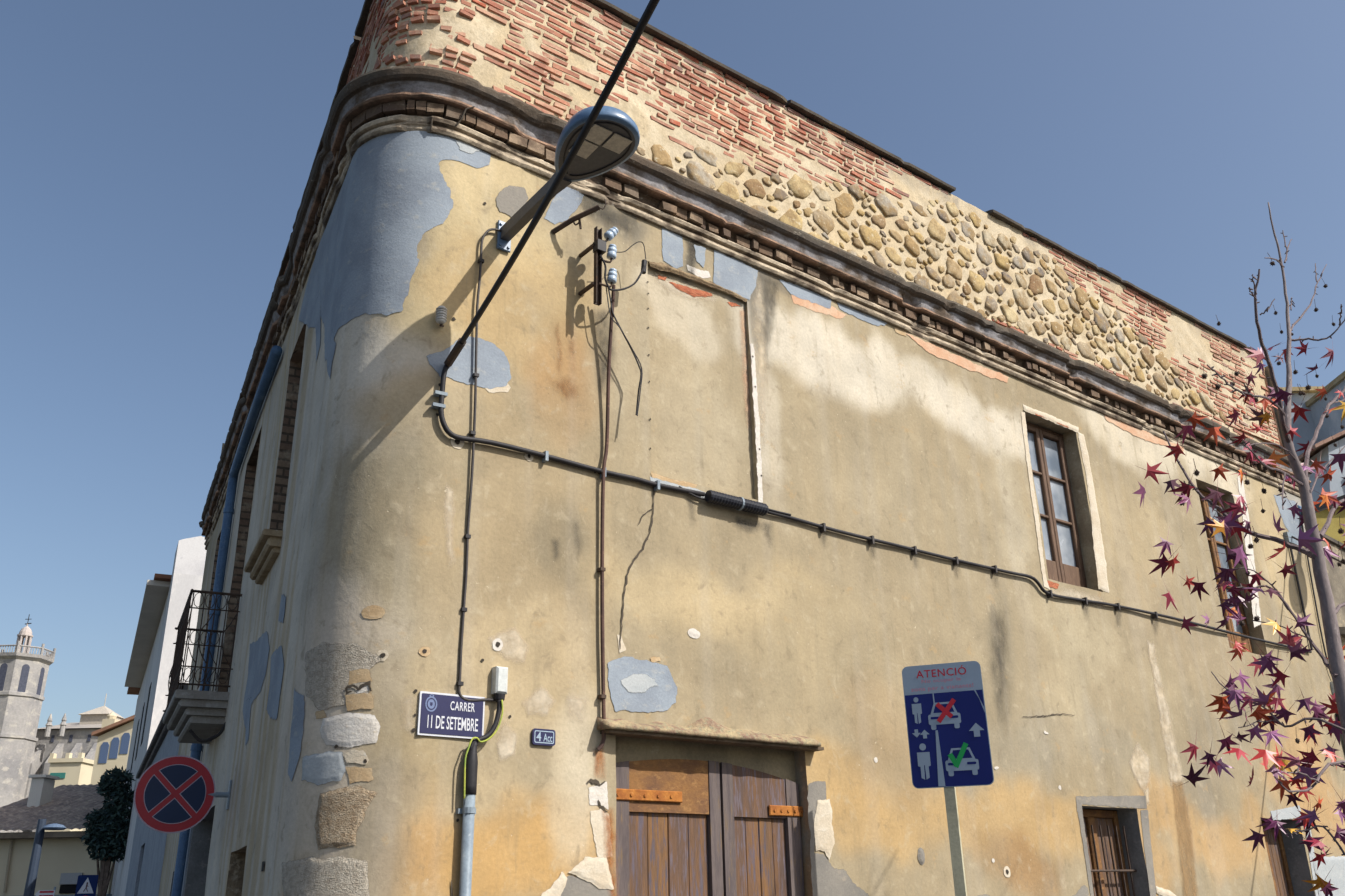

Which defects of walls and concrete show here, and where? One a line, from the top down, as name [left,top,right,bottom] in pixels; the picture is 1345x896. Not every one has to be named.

peeling [282,642,389,896]
peeling [541,856,614,896]
peeling [807,781,868,896]